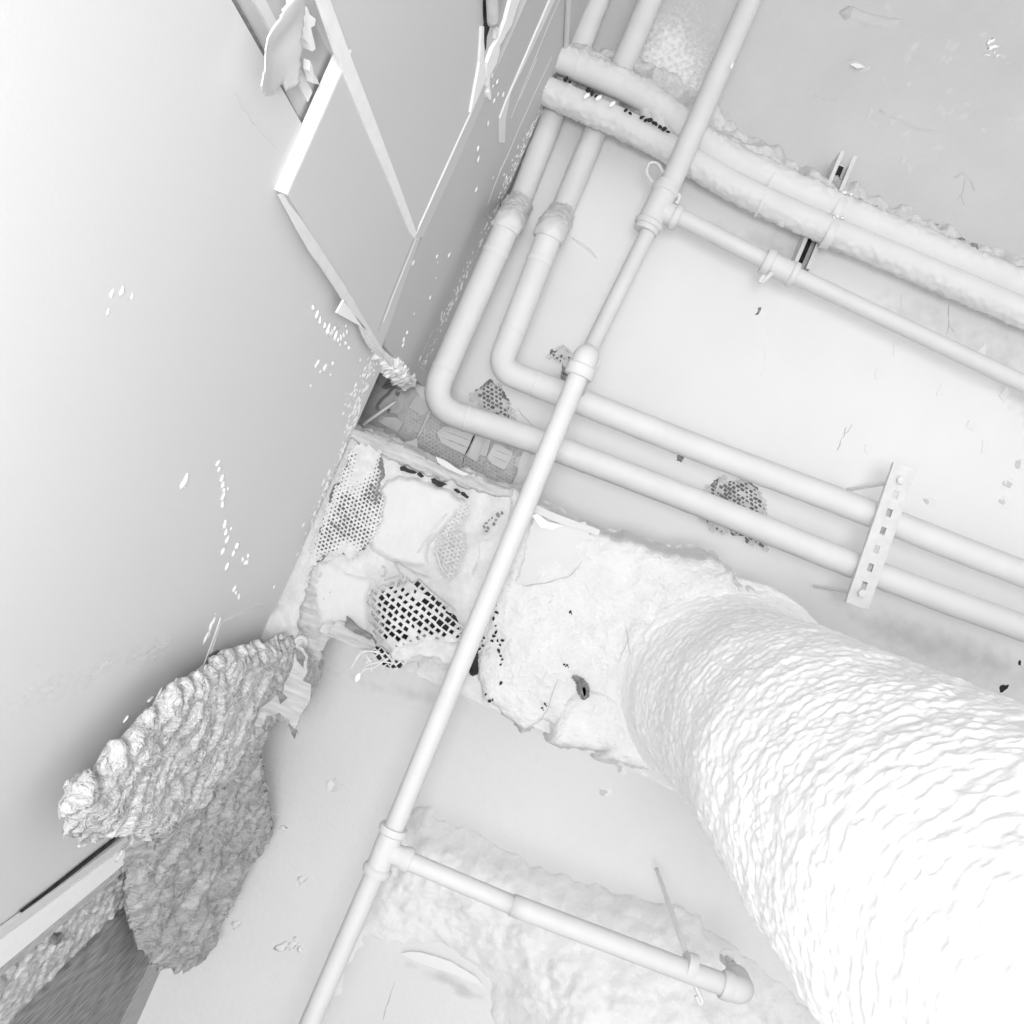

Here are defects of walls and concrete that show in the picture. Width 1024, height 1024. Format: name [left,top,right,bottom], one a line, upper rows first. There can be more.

spalling [469,379,516,420]
flaking render [436,457,469,476]
spalling [703,474,768,515]
flaking render [297,443,387,661]
flaking render [417,503,471,582]
flaking render [482,511,504,535]
spalling [698,517,769,552]